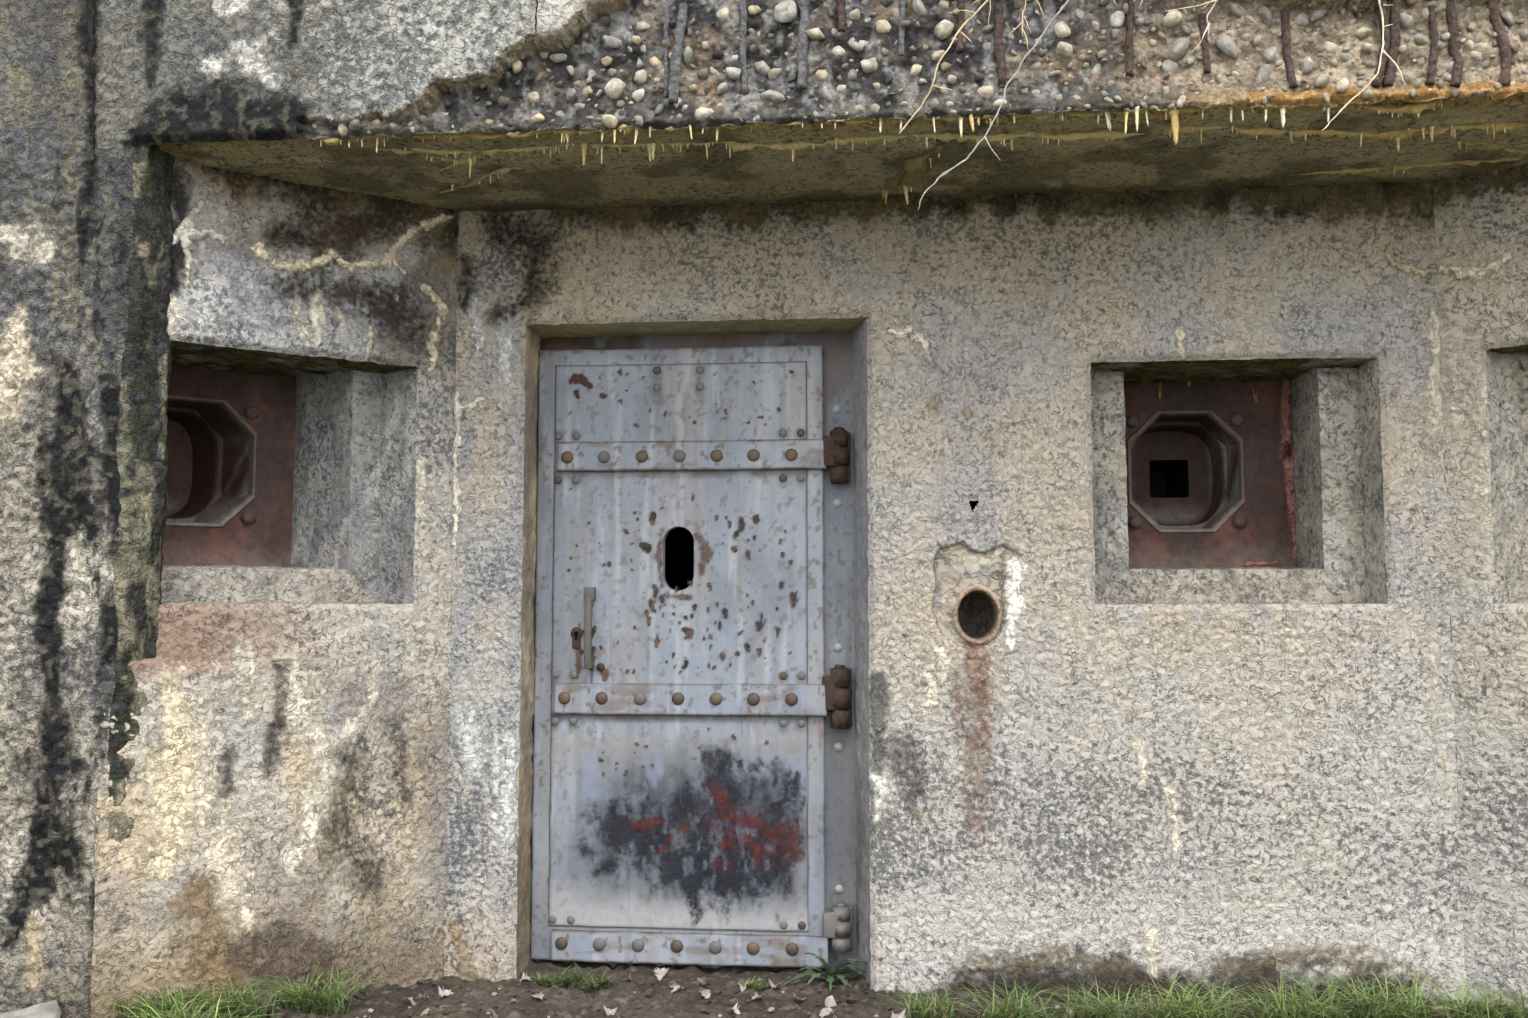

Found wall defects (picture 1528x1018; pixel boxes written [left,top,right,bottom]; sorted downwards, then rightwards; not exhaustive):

spalling [305,0,1528,140]
rust [1250,82,1528,106]
damp [166,168,193,341]
damp [208,99,1528,389]
crack [172,200,486,551]
rust [569,370,645,414]
damp [0,309,121,991]
rust [575,614,635,683]
rust [620,507,798,673]
spalling [932,541,1017,649]
damp [140,636,383,1006]
damp [456,707,519,856]